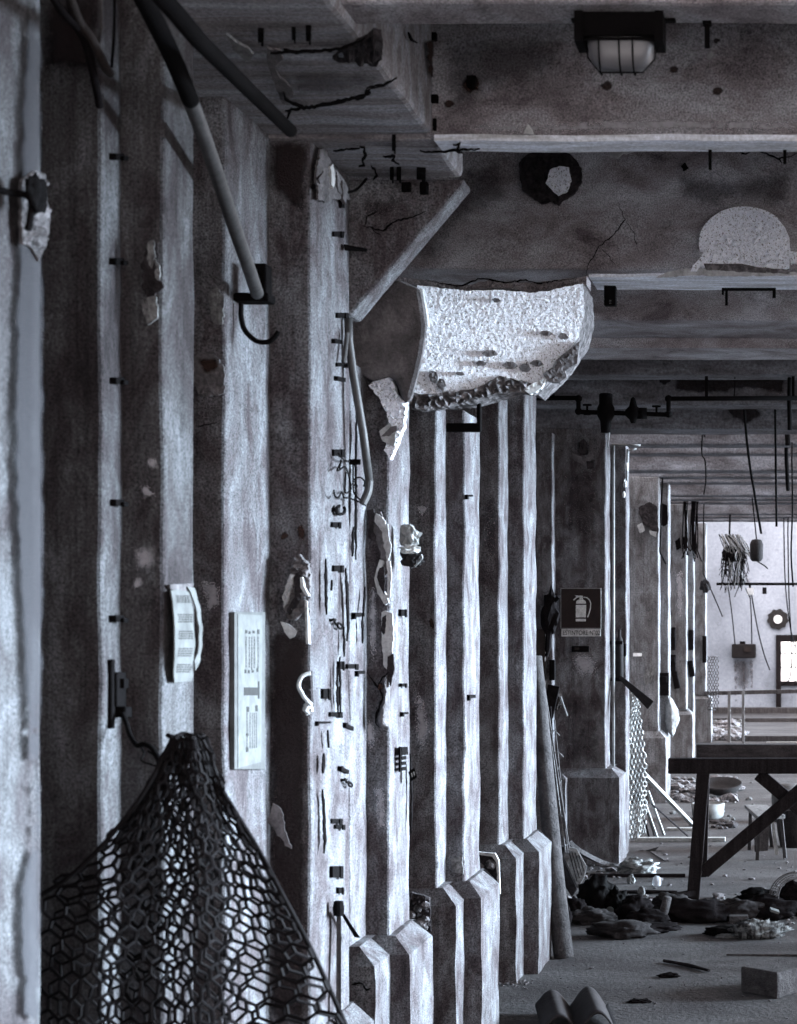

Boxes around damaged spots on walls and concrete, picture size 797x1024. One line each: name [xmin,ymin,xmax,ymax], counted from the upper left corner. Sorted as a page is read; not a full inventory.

crack [270,37,365,55]
spalling [333,28,383,67]
crack [283,77,397,118]
peeling [314,148,351,204]
crack [333,142,480,180]
spalling [519,152,582,206]
crack [428,209,638,287]
peeling [16,8,52,759]
spalling [369,276,594,460]
spalling [281,554,313,644]
peeling [367,509,395,687]
peeling [22,849,40,1019]